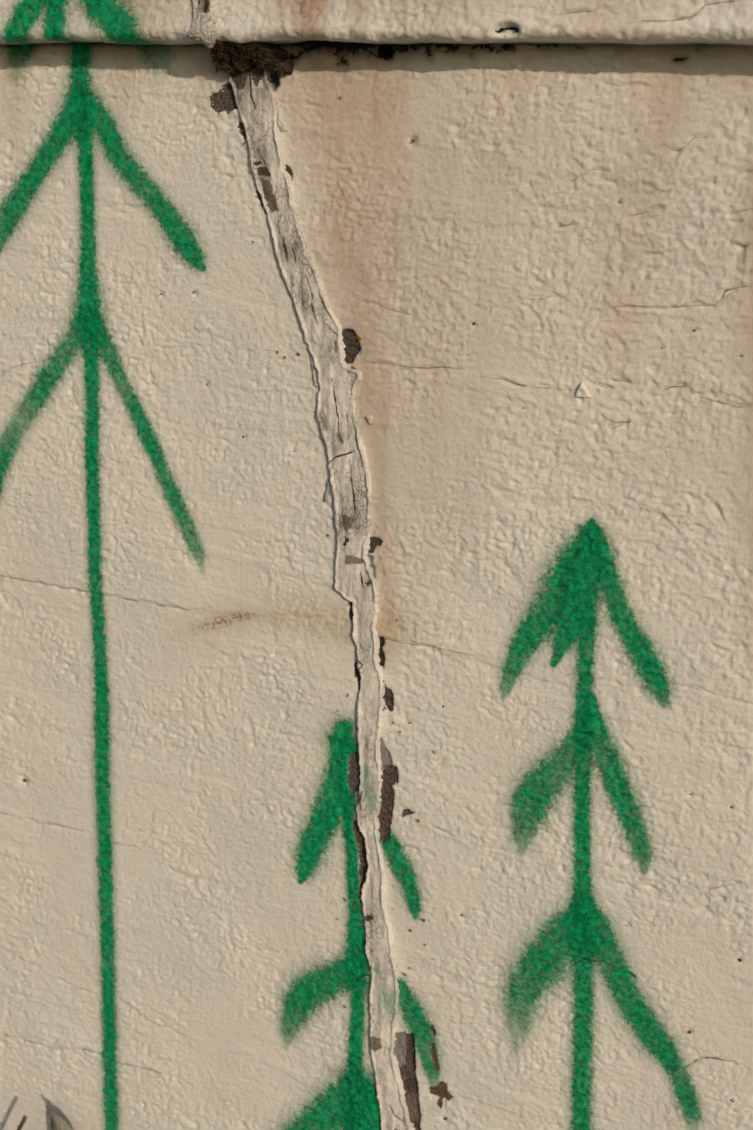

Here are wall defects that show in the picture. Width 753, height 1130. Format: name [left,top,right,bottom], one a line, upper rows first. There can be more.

crack [188,0,217,48]
spalling [209,82,247,141]
spalling [367,537,383,578]
crack [229,61,415,1130]
spalling [378,636,394,711]
spalling [346,751,361,795]
spalling [378,737,414,845]
spalling [351,821,368,903]
spalling [393,1026,454,1130]